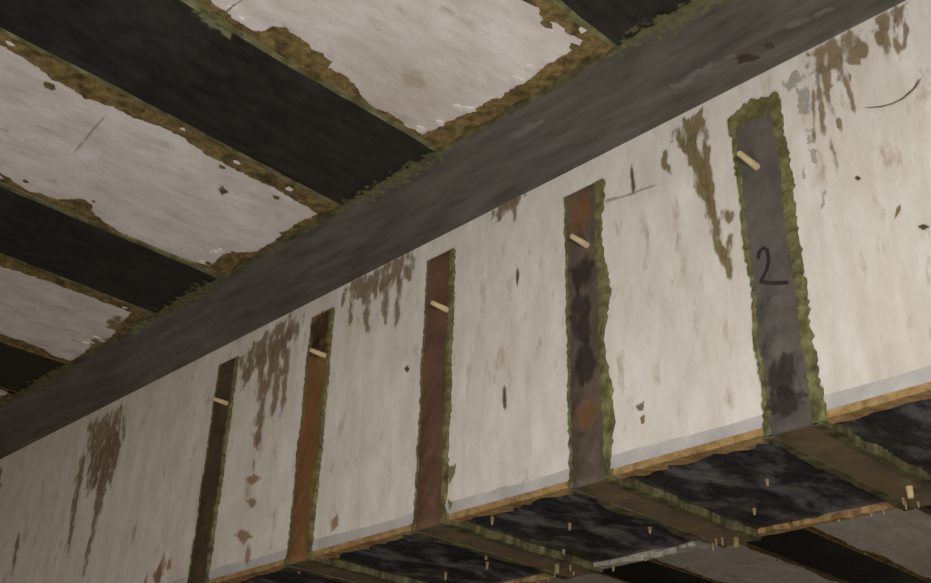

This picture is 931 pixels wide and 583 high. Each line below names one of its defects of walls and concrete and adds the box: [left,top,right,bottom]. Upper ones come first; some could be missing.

peeling [198,0,368,104]
peeling [377,0,611,147]
water stain [782,4,909,163]
peeling [0,32,338,274]
water stain [661,150,671,172]
water stain [672,108,734,278]
peeling [0,256,150,363]
water stain [239,314,299,440]
water stain [311,312,329,355]
water stain [341,253,414,332]
water stain [68,405,125,576]